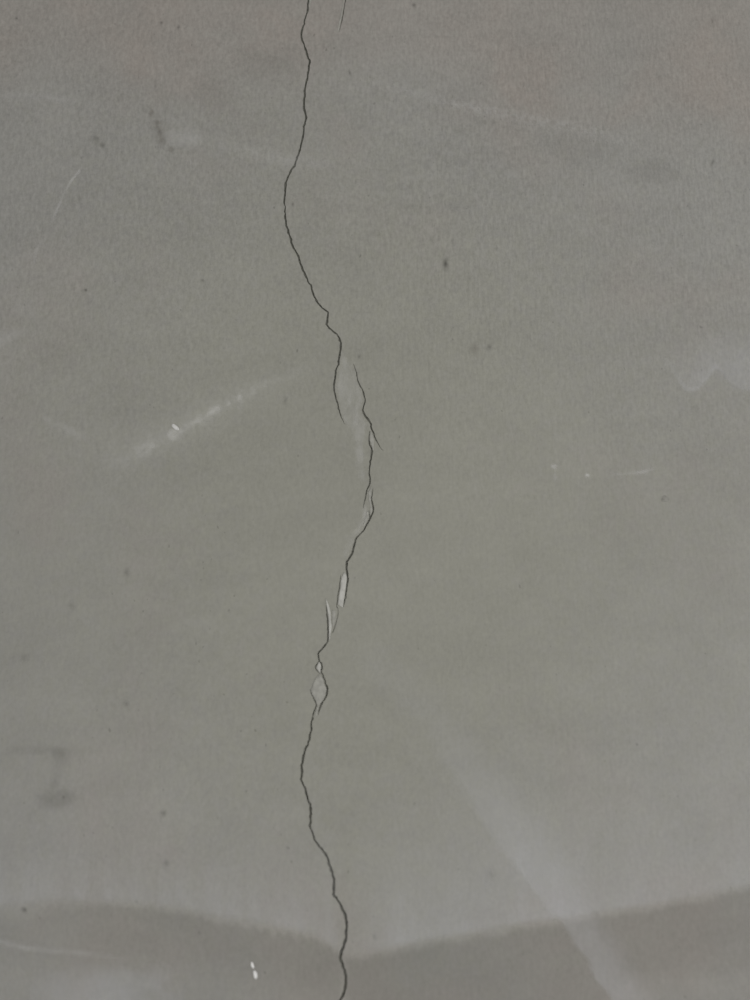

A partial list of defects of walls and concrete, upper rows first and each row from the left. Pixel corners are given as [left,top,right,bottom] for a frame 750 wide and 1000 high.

crack [283,0,381,1000]